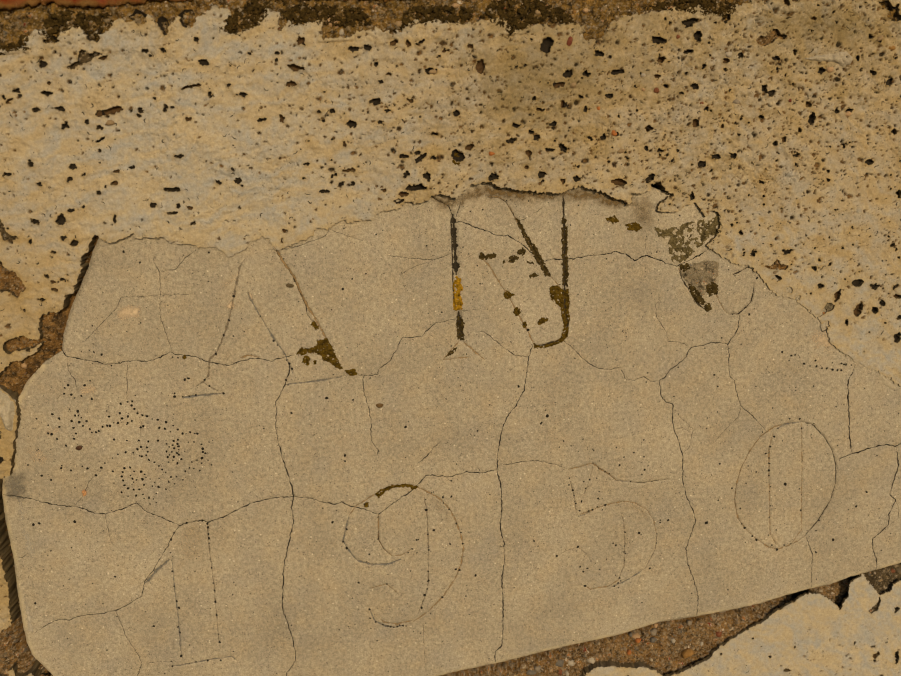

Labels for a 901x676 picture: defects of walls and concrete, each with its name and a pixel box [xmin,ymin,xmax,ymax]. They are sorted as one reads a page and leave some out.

spalling [0,0,751,69]
spalling [756,29,786,46]
spalling [879,1,899,21]
spalling [286,64,305,87]
crack [455,209,706,267]
spalling [765,249,793,279]
spalling [0,236,99,436]
crack [3,249,561,676]
crack [565,300,766,615]
crack [840,372,900,570]
spalling [0,602,53,676]
spalling [440,563,901,676]